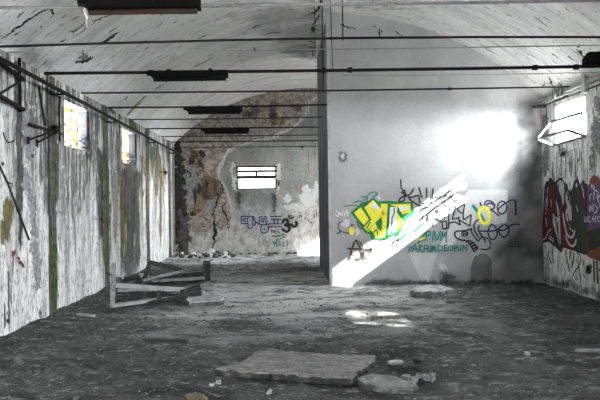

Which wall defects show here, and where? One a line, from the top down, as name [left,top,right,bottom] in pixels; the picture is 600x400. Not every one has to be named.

crack [1,9,54,39]
leakage [67,115,159,277]
crack [186,161,229,248]
flaking render [174,88,319,233]